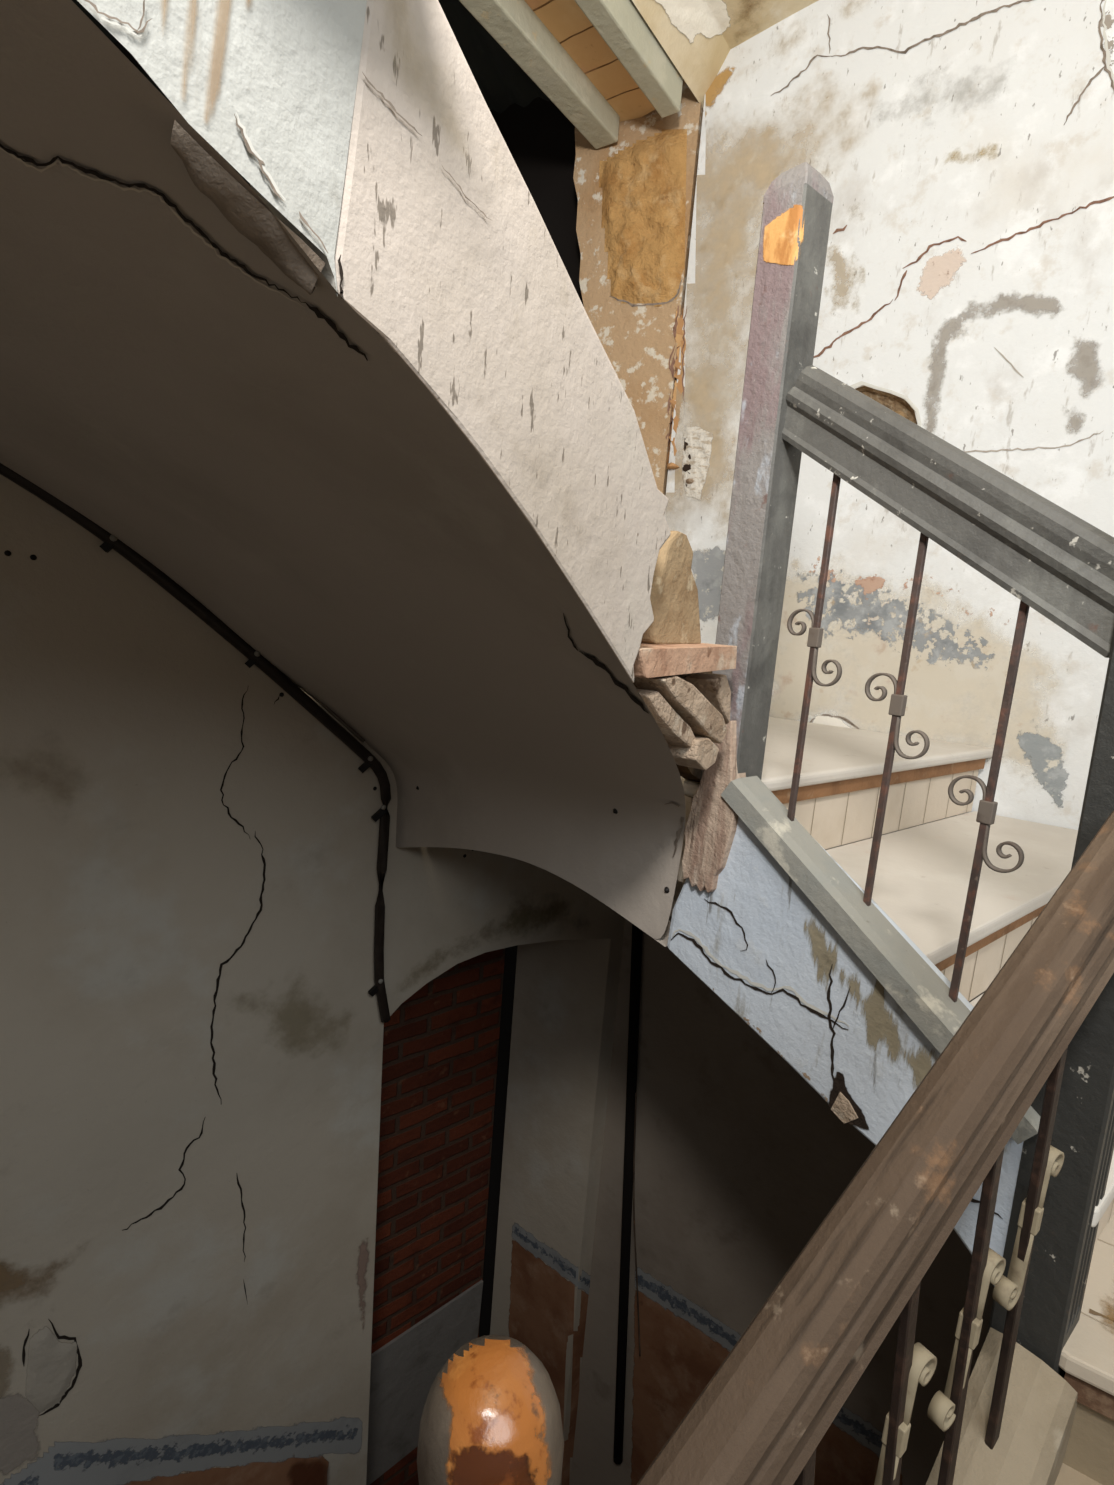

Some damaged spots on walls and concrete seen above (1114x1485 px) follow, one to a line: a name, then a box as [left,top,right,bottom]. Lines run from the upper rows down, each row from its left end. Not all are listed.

peeling [655,0,731,43]
crack [771,0,1032,96]
crack [1064,0,1114,125]
crack [0,112,368,361]
flaking render [599,129,687,307]
crack [814,196,1114,358]
flaking render [666,426,713,500]
flaking render [641,531,725,645]
spalling [633,671,731,782]
crack [122,689,280,1231]
crack [671,899,851,1081]
leakage [0,1262,51,1297]